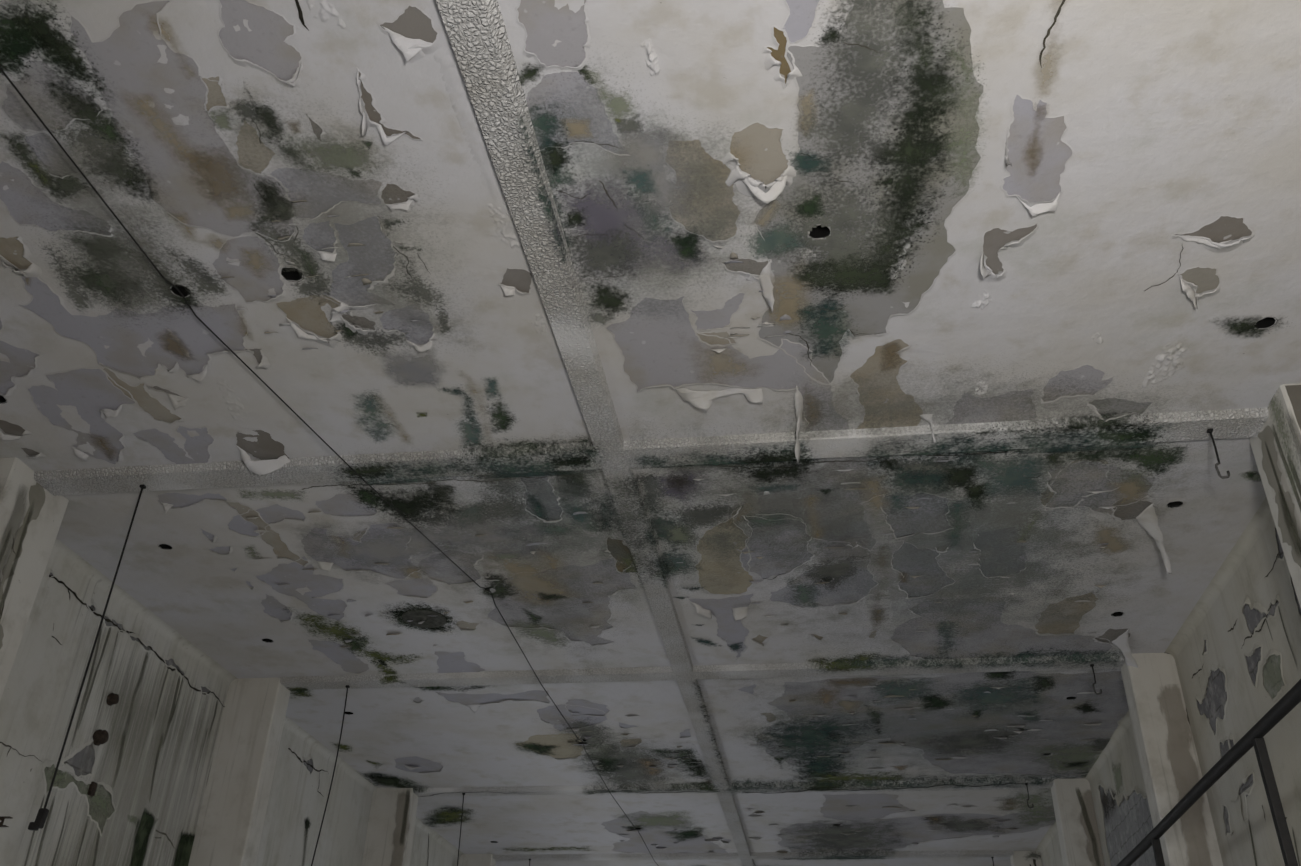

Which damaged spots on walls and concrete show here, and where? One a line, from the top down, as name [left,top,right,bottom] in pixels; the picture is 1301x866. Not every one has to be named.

leakage [0,4,154,200]
peeling [0,0,386,465]
leakage [521,66,701,324]
peeling [605,0,1114,660]
leakage [746,0,978,356]
crack [1039,0,1065,68]
crack [49,575,225,707]
leakage [315,324,812,642]
peeling [601,810,732,860]
leakage [567,648,1119,866]
peeling [737,670,1156,866]
peeling [1242,425,1301,702]